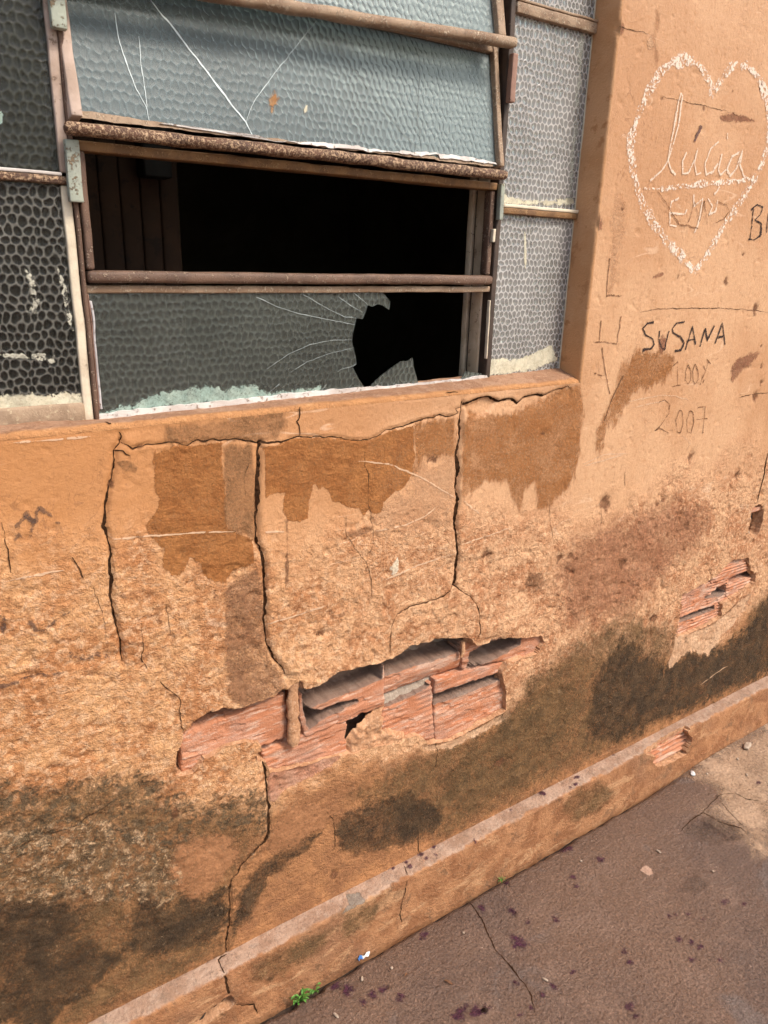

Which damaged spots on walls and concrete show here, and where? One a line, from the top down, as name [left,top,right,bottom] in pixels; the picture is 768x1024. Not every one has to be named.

damp [597,350,673,450]
flaking render [378,456,455,530]
crack [72,386,571,731]
flaking render [669,557,756,668]
flaking render [176,635,545,802]
damp [335,507,768,870]
flaking render [644,726,693,767]
damp [0,770,325,1024]
crack [218,761,271,1013]
damp [342,905,378,936]
crack [399,794,419,921]
damp [331,982,405,1006]